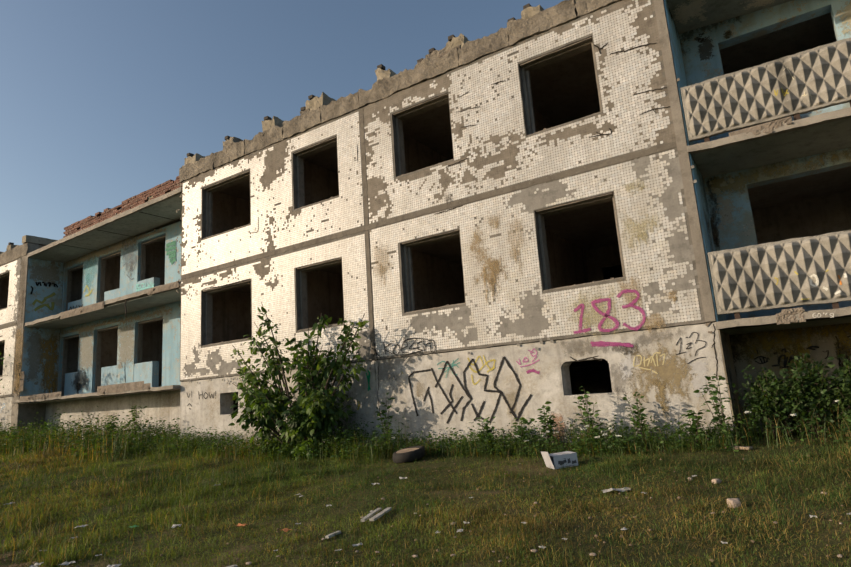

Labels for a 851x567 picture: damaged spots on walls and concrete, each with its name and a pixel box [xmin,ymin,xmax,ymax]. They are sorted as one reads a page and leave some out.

crack [594,42,657,55]
peeling [694,32,714,61]
crack [633,87,670,115]
peeling [355,46,620,232]
peeling [534,0,700,324]
peeling [405,284,559,354]
peeling [183,343,242,384]